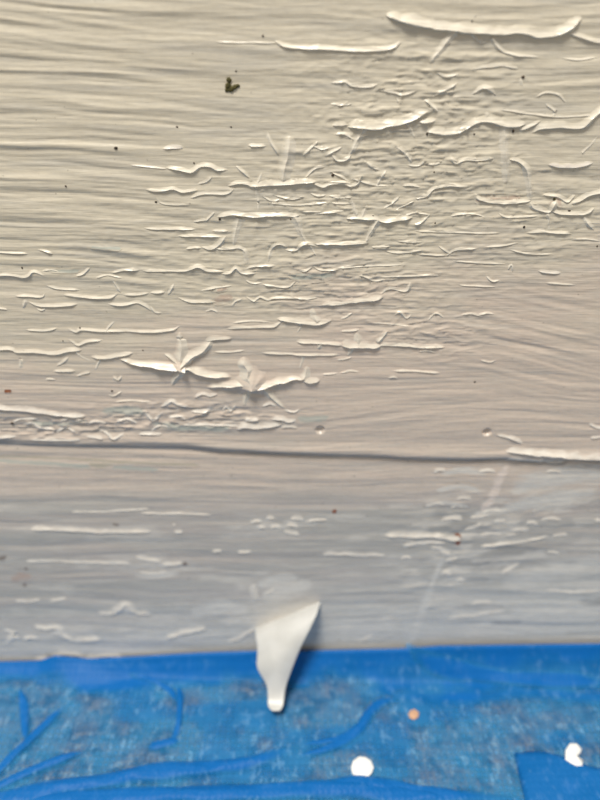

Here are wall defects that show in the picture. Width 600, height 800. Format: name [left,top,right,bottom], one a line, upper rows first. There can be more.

peeling [0,391,300,441]
peeling [496,434,600,473]
peeling [228,602,320,711]